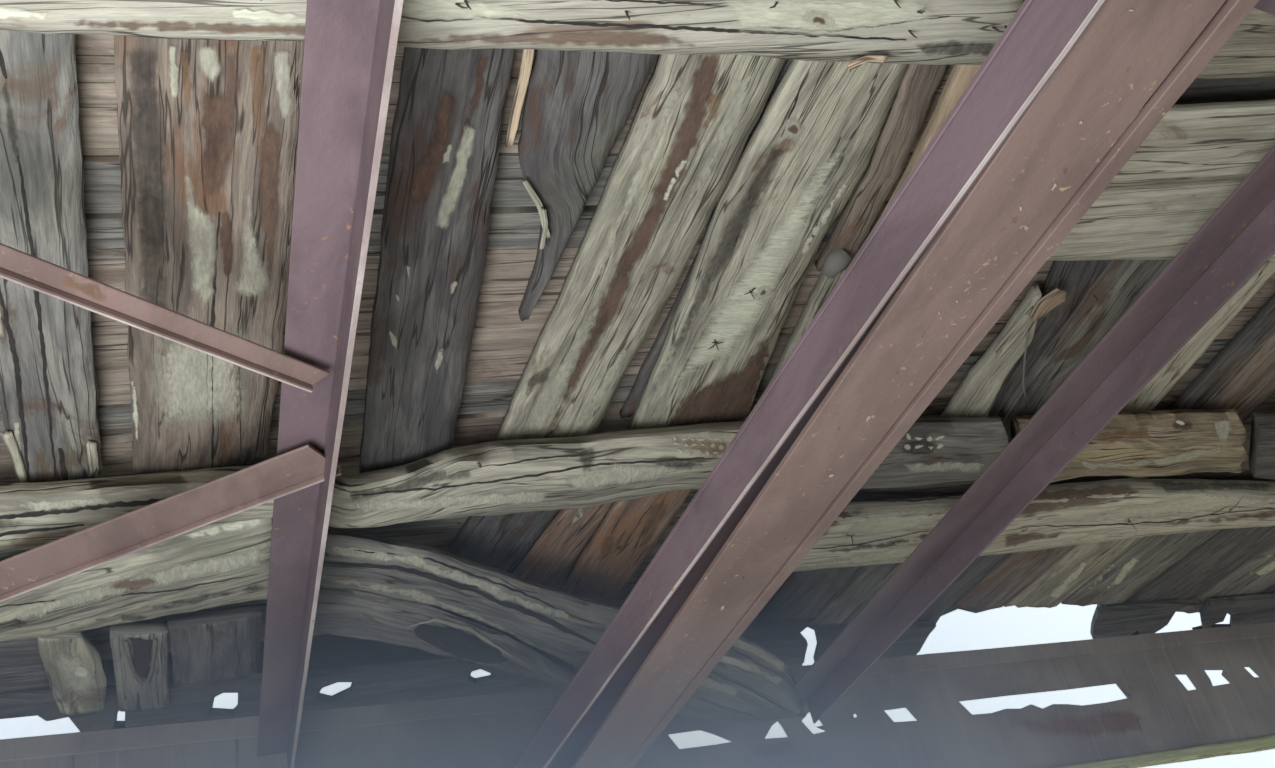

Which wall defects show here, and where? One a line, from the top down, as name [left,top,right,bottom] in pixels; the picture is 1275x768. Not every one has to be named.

water stain [133,54,163,305]
water stain [202,61,238,194]
water stain [220,214,232,276]
water stain [260,125,279,261]
crack [0,498,165,537]
crack [351,453,704,496]